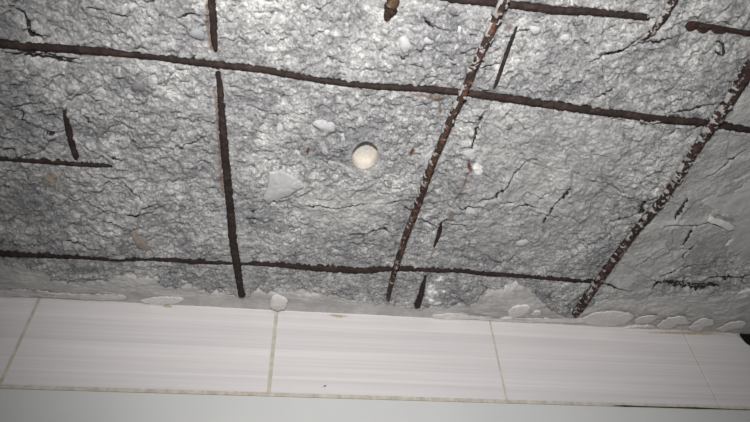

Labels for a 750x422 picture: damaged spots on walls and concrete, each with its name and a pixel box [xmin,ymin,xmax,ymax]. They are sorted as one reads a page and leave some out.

crack [9,5,78,63]
crack [14,105,63,136]
crack [465,114,483,149]
spalling [0,0,750,332]
crack [427,162,571,226]
crack [611,199,652,221]
crack [653,198,746,291]
peeling [717,321,750,345]